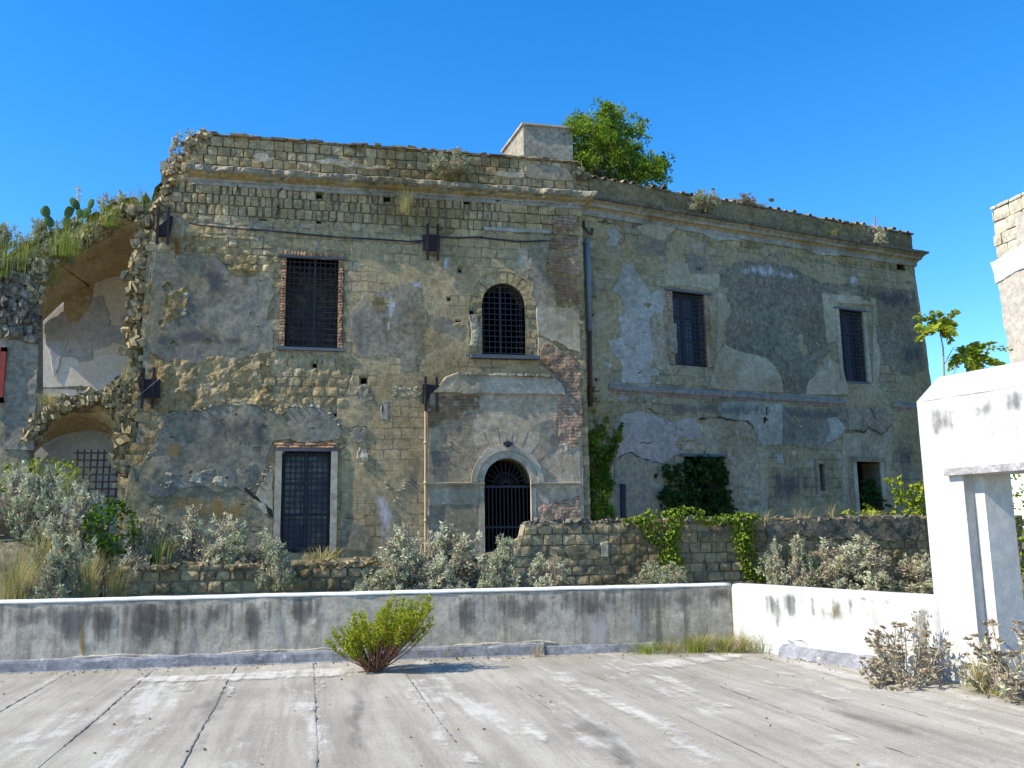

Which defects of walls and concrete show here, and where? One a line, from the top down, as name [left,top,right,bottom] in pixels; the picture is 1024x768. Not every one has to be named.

spalling [190,233,279,272]
peeling [43,127,213,489]
spalling [650,312,678,384]
spalling [157,349,480,429]
crack [619,408,758,464]
crack [848,407,891,435]
spalling [189,469,228,487]
leakage [19,604,168,641]
leakage [765,596,794,613]